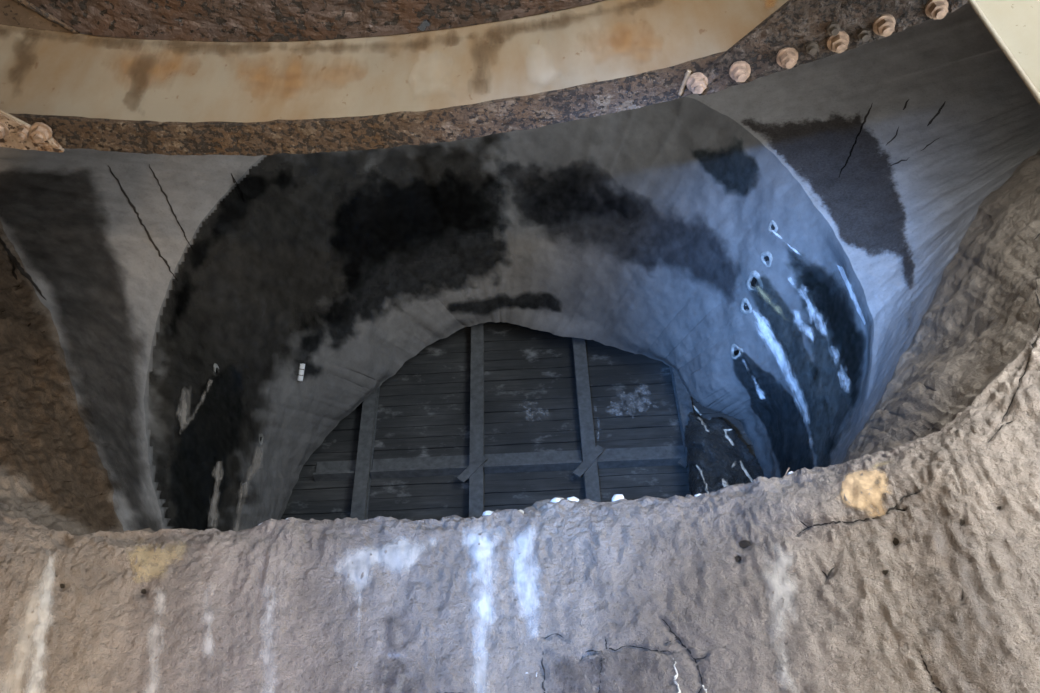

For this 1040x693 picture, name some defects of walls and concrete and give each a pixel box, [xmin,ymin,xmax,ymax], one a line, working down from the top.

corrosion [476,16,570,85]
water stain [694,143,757,194]
water stain [744,115,915,286]
water stain [0,135,730,532]
water stain [733,231,866,477]
crack [989,277,1040,441]
crack [797,491,920,535]
water stain [339,541,420,590]
water stain [469,534,491,572]
water stain [3,560,52,693]
crack [541,634,562,693]
crack [580,619,705,693]